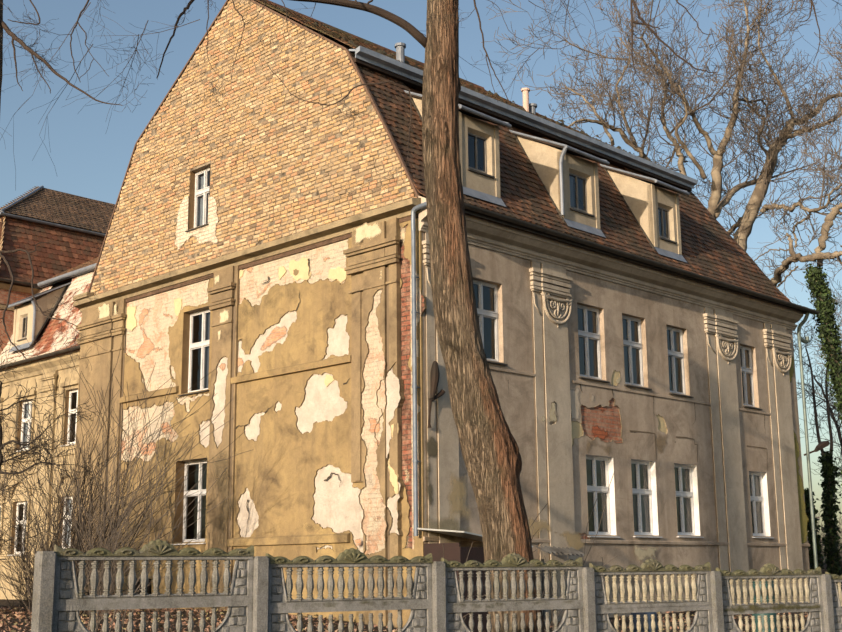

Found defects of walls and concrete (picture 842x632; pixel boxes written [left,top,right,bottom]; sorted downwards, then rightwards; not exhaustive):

flaking render [0,289,35,354]
spalling [99,275,219,392]
spalling [121,223,381,462]
spalling [311,224,426,555]
spalling [570,388,623,445]
spalling [236,488,259,537]